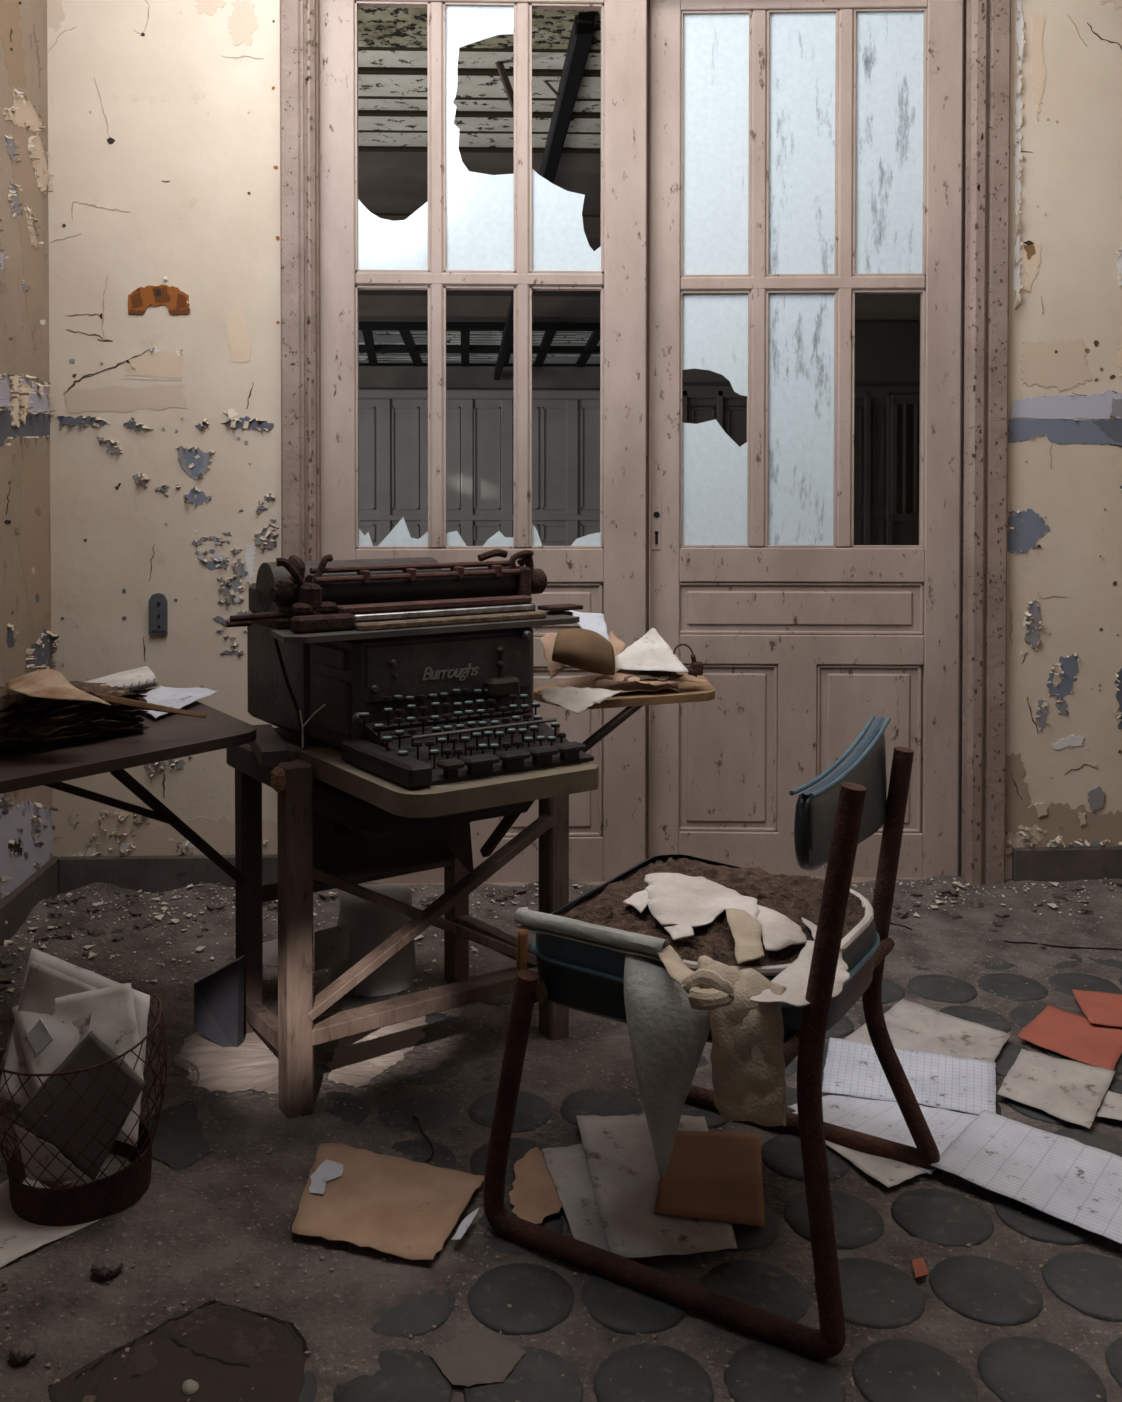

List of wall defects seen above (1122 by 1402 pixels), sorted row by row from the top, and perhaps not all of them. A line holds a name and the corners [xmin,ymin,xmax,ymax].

crack [1067,14,1122,50]
peeling [0,89,54,271]
peeling [976,0,1047,309]
crack [63,274,150,395]
rust [128,284,190,315]
peeling [115,416,216,506]
peeling [972,367,1122,475]
peeling [192,491,279,656]
peeling [995,498,1050,554]
peeling [1035,653,1122,730]
peeling [0,790,61,898]
peeling [0,882,236,1014]